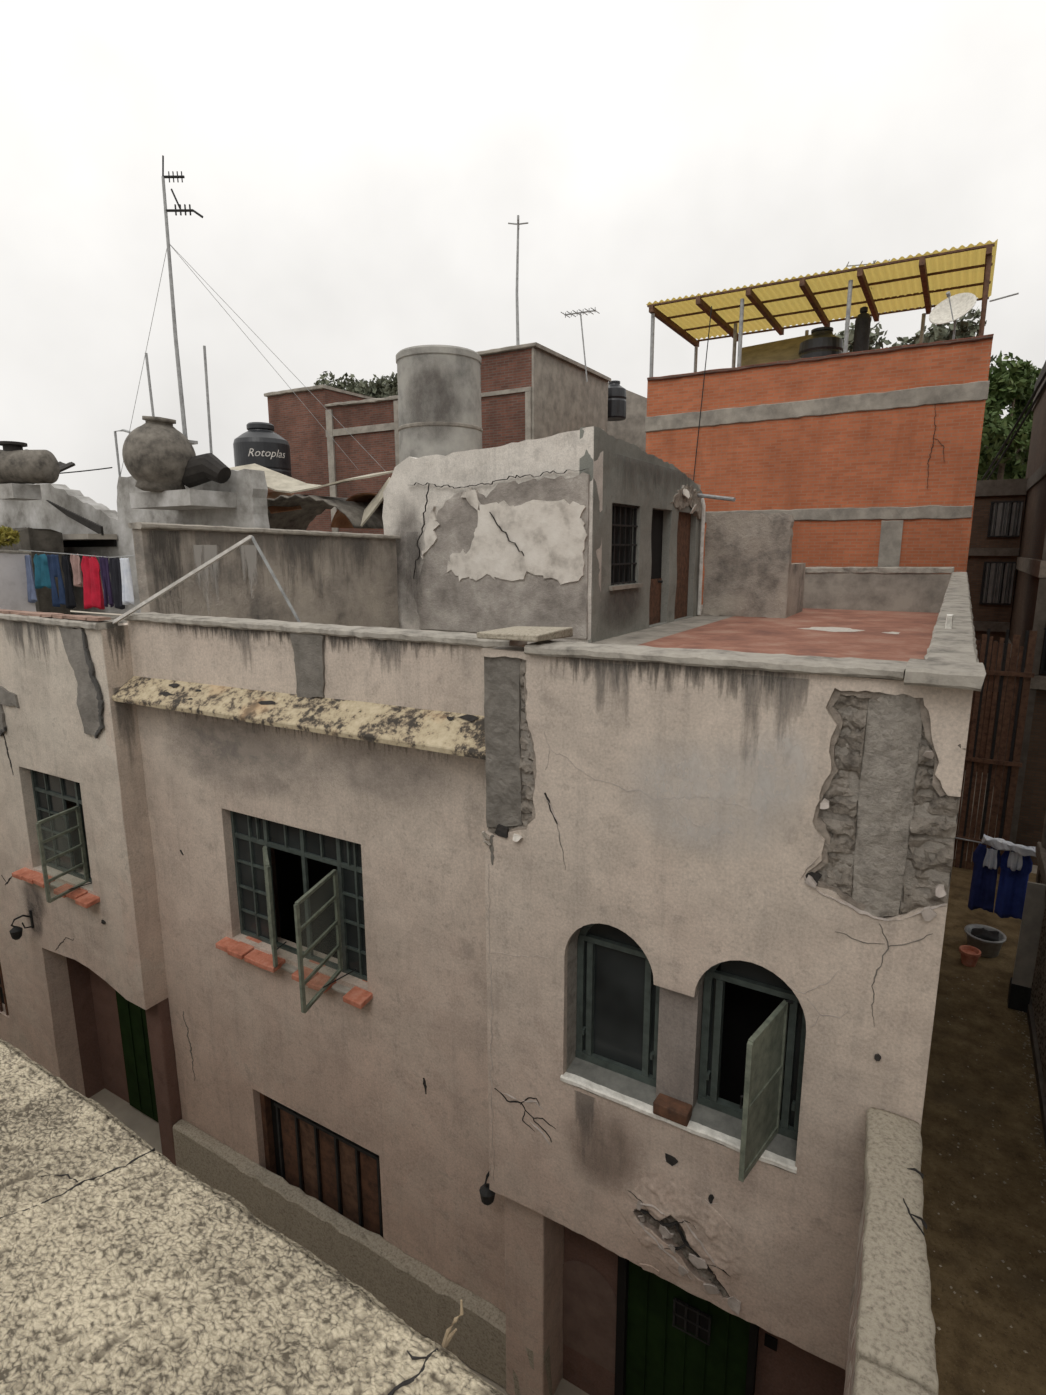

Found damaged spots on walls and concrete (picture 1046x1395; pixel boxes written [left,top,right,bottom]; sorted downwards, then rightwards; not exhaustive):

peeling [413,472,590,639]
leakage [564,657,786,686]
flaking render [447,656,536,865]
flaking render [797,688,960,921]
crack [790,924,931,1027]
crack [494,1088,556,1145]
crack [0,1148,155,1219]
flaking render [637,1201,741,1315]